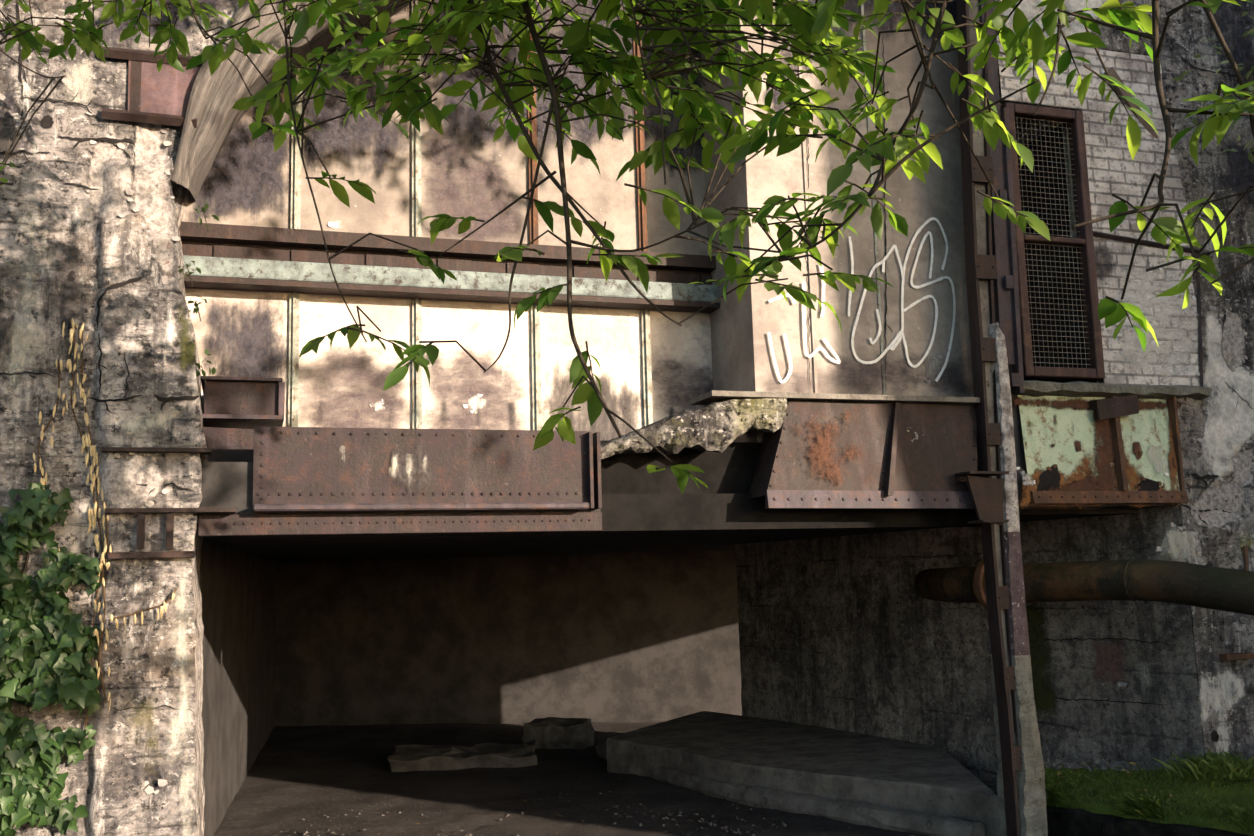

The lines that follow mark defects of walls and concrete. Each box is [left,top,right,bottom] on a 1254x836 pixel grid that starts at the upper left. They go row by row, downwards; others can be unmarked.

damp [191,105,290,222]
damp [305,137,324,164]
damp [375,143,392,167]
damp [426,139,520,241]
crack [89,277,199,413]
rust [1013,397,1153,509]
rust [1132,400,1181,504]